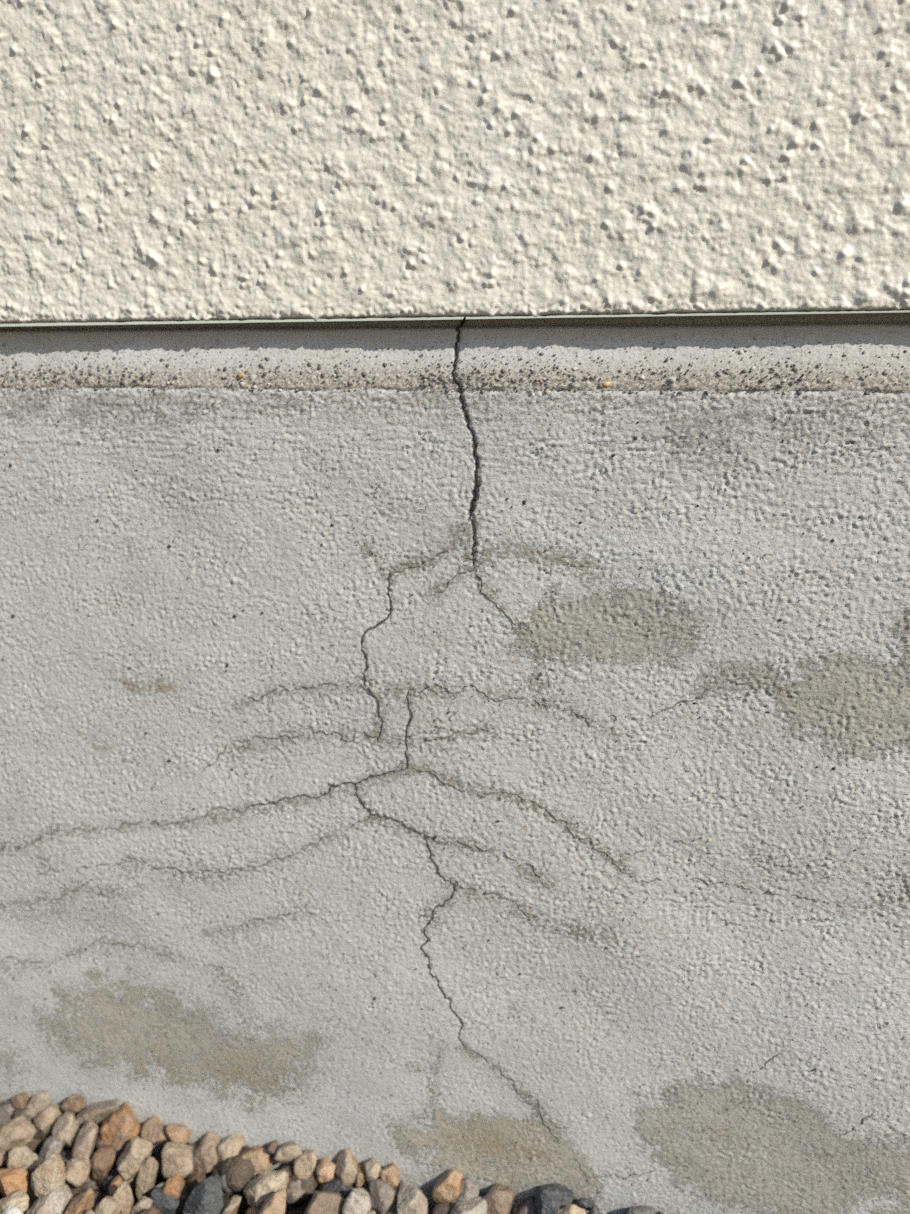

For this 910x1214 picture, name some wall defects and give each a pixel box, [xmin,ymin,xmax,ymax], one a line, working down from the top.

damp [230,673,498,760]
crack [0,316,750,1195]
damp [358,514,910,761]
damp [0,762,639,1113]
crack [691,877,844,907]
damp [628,1071,910,1214]